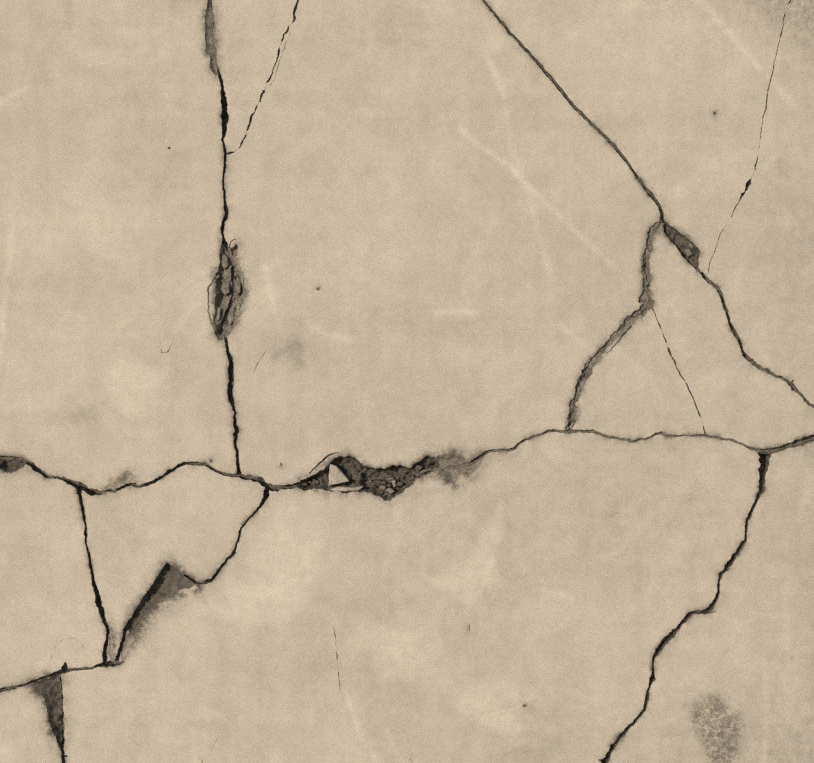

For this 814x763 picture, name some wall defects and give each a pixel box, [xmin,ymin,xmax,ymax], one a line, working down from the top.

flaking render [213,242,247,340]
crack [0,0,307,763]
crack [415,0,814,763]
flaking render [297,450,484,501]
flaking render [106,562,203,661]